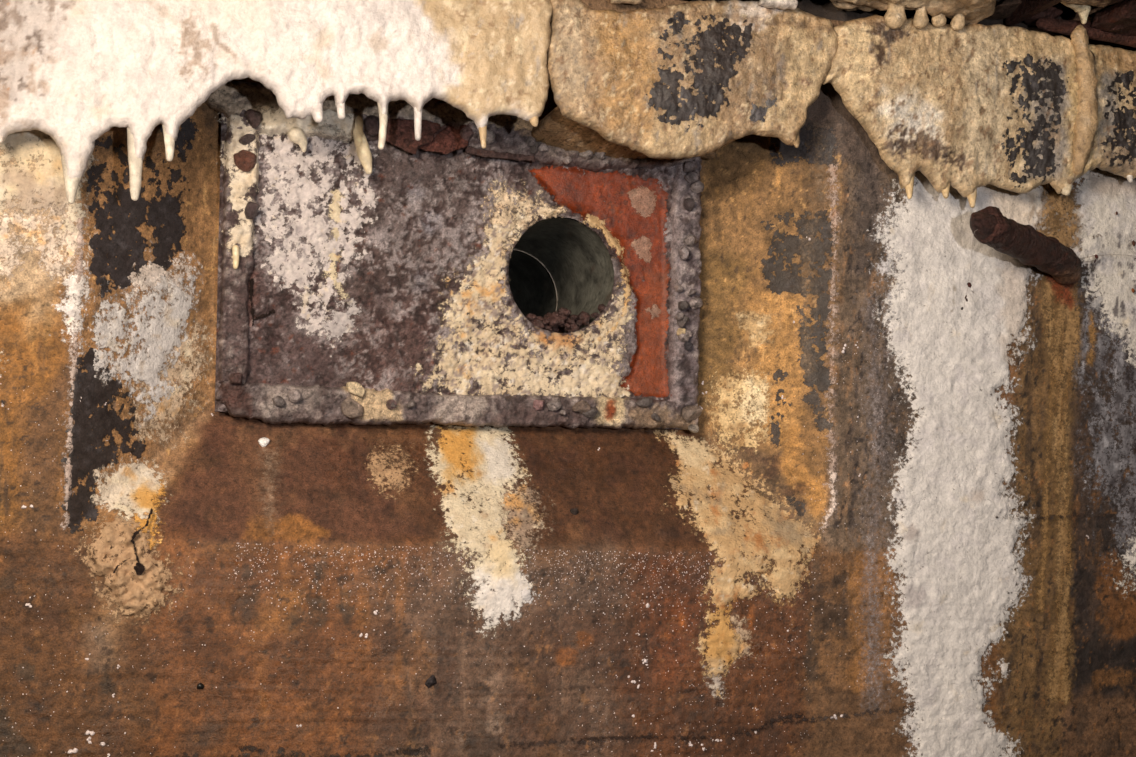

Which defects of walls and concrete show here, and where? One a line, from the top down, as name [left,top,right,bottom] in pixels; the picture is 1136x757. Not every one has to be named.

corrosion [377,118,535,162]
corrosion [1037,184,1080,247]
efflorescence [423,425,553,637]
efflorescence [653,143,842,698]
corrosion [1035,272,1096,705]